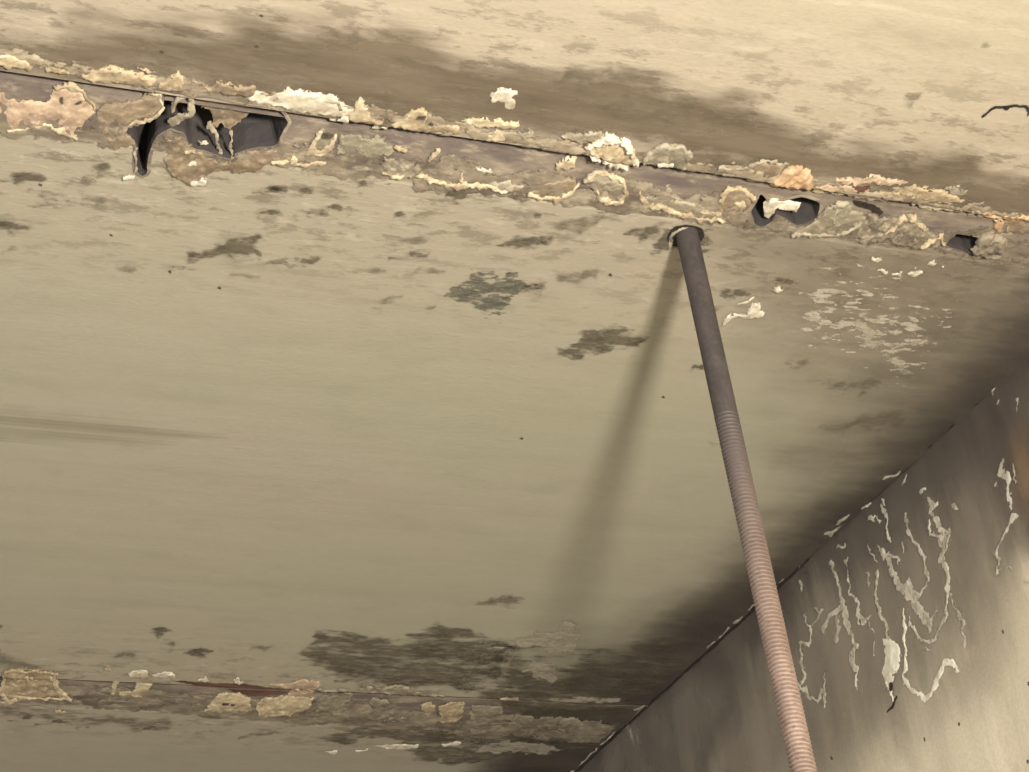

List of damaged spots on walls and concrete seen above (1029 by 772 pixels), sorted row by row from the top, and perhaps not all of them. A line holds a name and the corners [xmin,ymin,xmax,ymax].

hole [124,88,292,178]
peeling [491,87,518,109]
water stain [0,47,1029,386]
hole [750,192,823,228]
hole [945,234,979,256]
water stain [772,324,1029,766]
water stain [0,580,791,772]